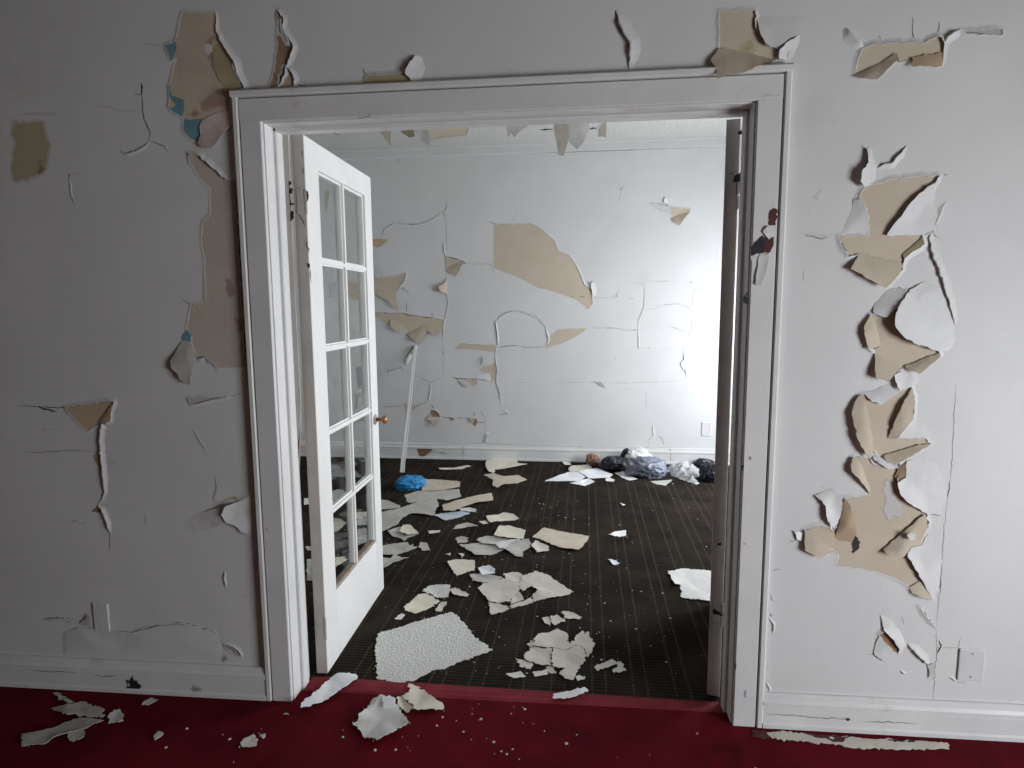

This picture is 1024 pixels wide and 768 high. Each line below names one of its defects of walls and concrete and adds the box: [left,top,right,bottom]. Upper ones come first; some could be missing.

peeling [708,5,804,79]
peeling [842,18,1006,82]
crack [97,83,167,157]
peeling [162,7,304,408]
peeling [373,265,445,344]
crack [373,203,449,404]
peeling [488,222,594,310]
peeling [742,208,778,305]
crack [494,280,716,460]
peeling [794,145,956,602]
peeling [19,397,118,548]
peeling [184,483,255,537]